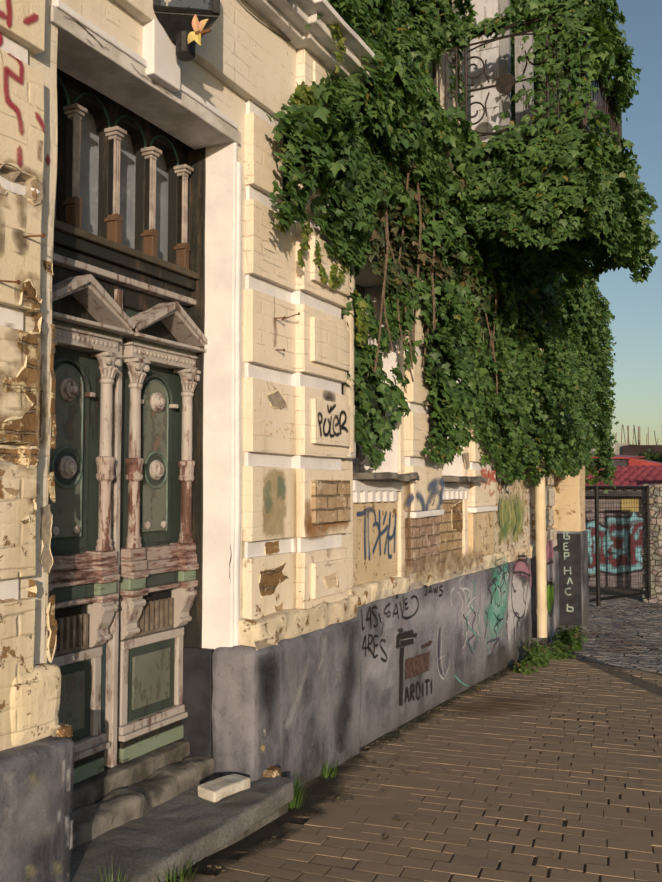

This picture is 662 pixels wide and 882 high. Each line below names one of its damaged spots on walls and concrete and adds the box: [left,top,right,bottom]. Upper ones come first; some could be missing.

peeling [0,277,56,470]
spalling [20,471,56,574]
spalling [0,577,37,606]
spalling [46,595,58,663]
leakage [261,662,276,719]
leakage [338,647,355,746]